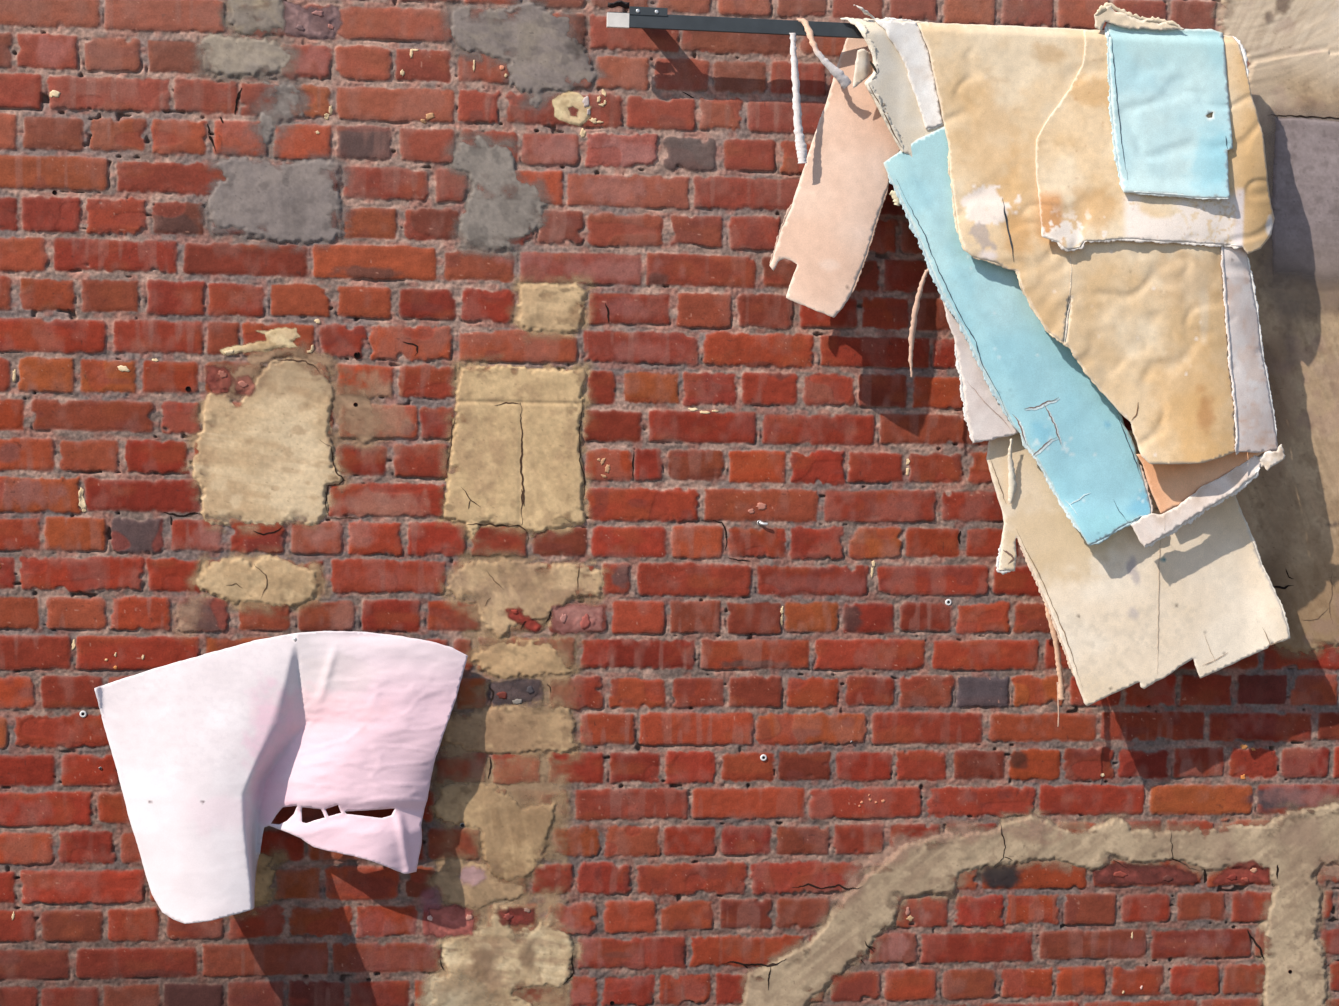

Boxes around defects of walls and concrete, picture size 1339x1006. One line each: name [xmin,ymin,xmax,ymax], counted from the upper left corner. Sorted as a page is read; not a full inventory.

leakage [1266,0,1289,21]
peeling [206,327,314,396]
spalling [1259,444,1285,471]
crack [446,402,529,543]
spalling [506,604,603,635]
spalling [487,679,541,705]
spalling [1092,863,1197,886]
spalling [1213,860,1269,884]
spalling [427,905,474,938]
spalling [499,908,534,925]